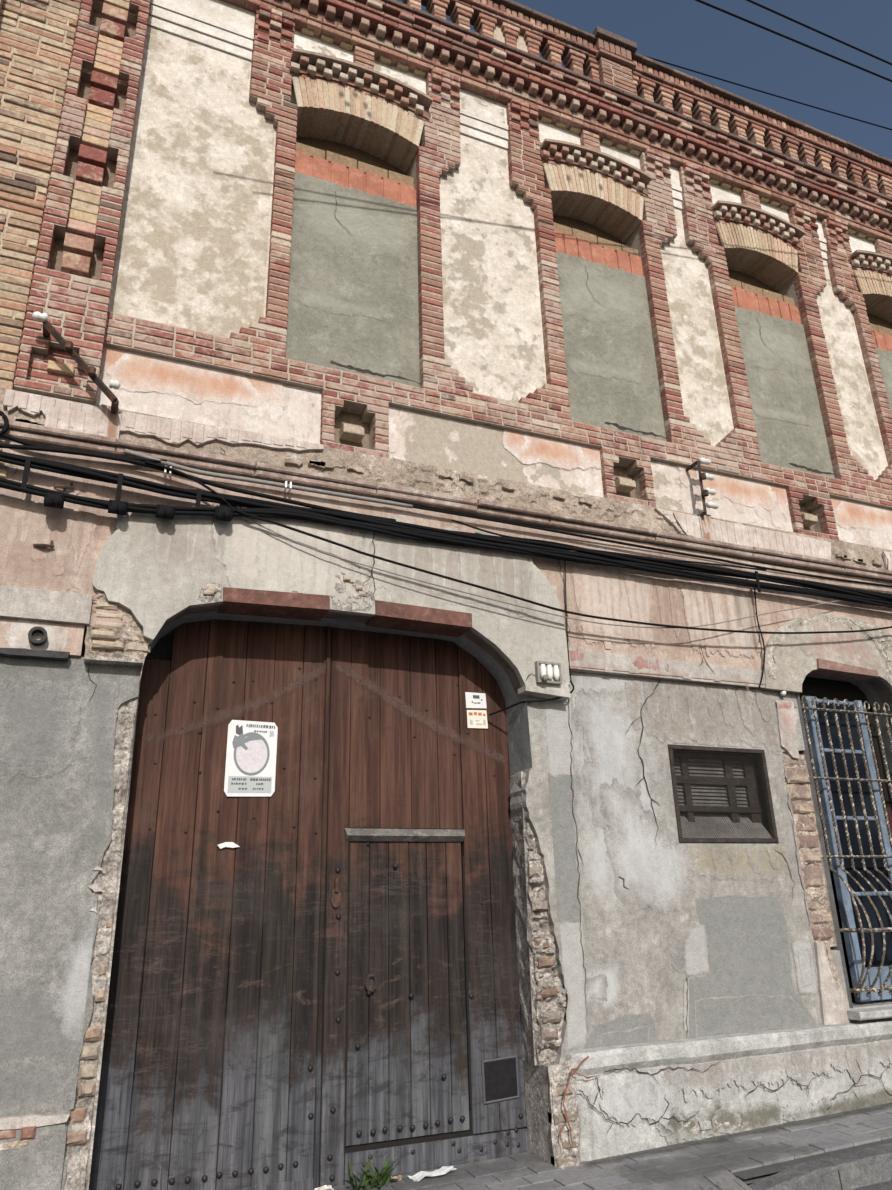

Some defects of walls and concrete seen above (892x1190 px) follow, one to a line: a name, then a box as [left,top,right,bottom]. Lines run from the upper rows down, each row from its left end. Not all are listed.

peeling [131,407,684,534]
peeling [5,619,68,651]
spalling [767,616,892,683]
spalling [63,591,152,1190]
spalling [509,770,581,1170]
crack [560,679,720,1156]
spalling [783,752,841,989]
crack [745,1057,891,1110]